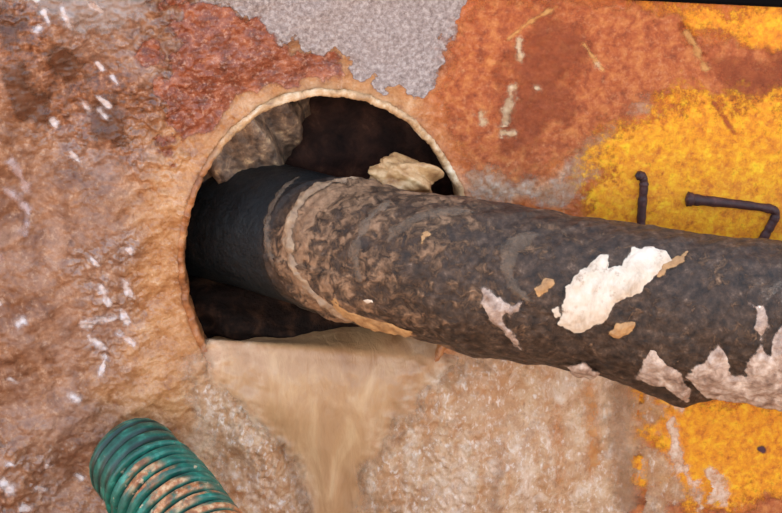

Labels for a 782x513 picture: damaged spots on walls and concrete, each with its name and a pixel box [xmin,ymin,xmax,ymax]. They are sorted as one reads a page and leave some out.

damp [83,97,112,119]
rust [134,0,345,167]
spalling [200,0,467,98]
rust [438,0,782,184]
damp [8,158,27,189]
damp [80,285,130,375]
rust [746,491,782,513]